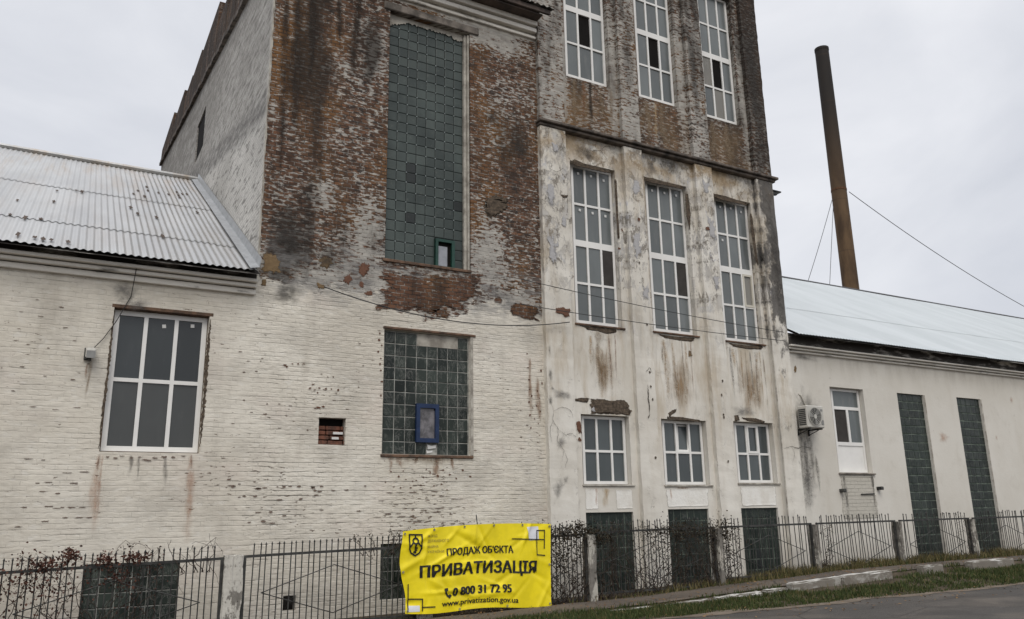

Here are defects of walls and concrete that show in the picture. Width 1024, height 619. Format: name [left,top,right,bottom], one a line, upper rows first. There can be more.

flaking render [343,262,486,317]
flaking render [494,296,540,321]
spalling [575,398,632,415]